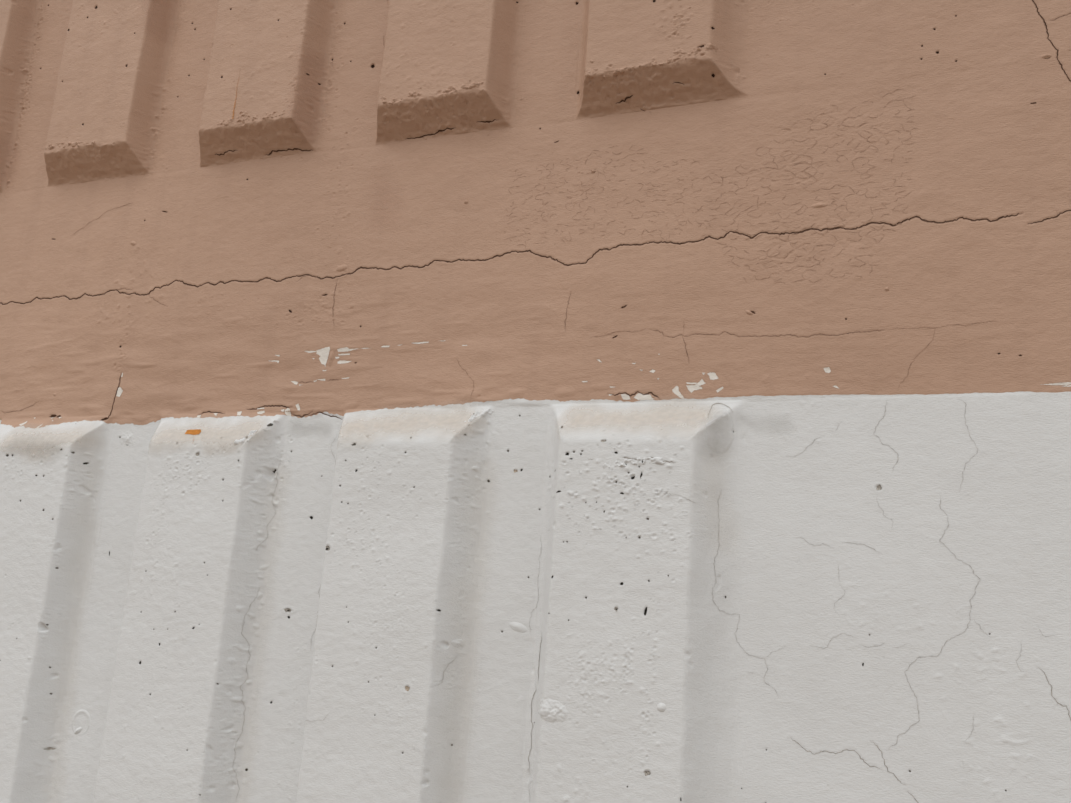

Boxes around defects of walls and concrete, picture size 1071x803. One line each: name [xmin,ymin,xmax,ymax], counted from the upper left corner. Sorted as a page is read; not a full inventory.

crack [1032,0,1071,81]
crack [0,89,1071,309]
peeling [305,347,368,382]
peeling [609,386,653,400]
peeling [672,372,723,399]
crack [793,401,984,803]
crack [1016,660,1071,720]